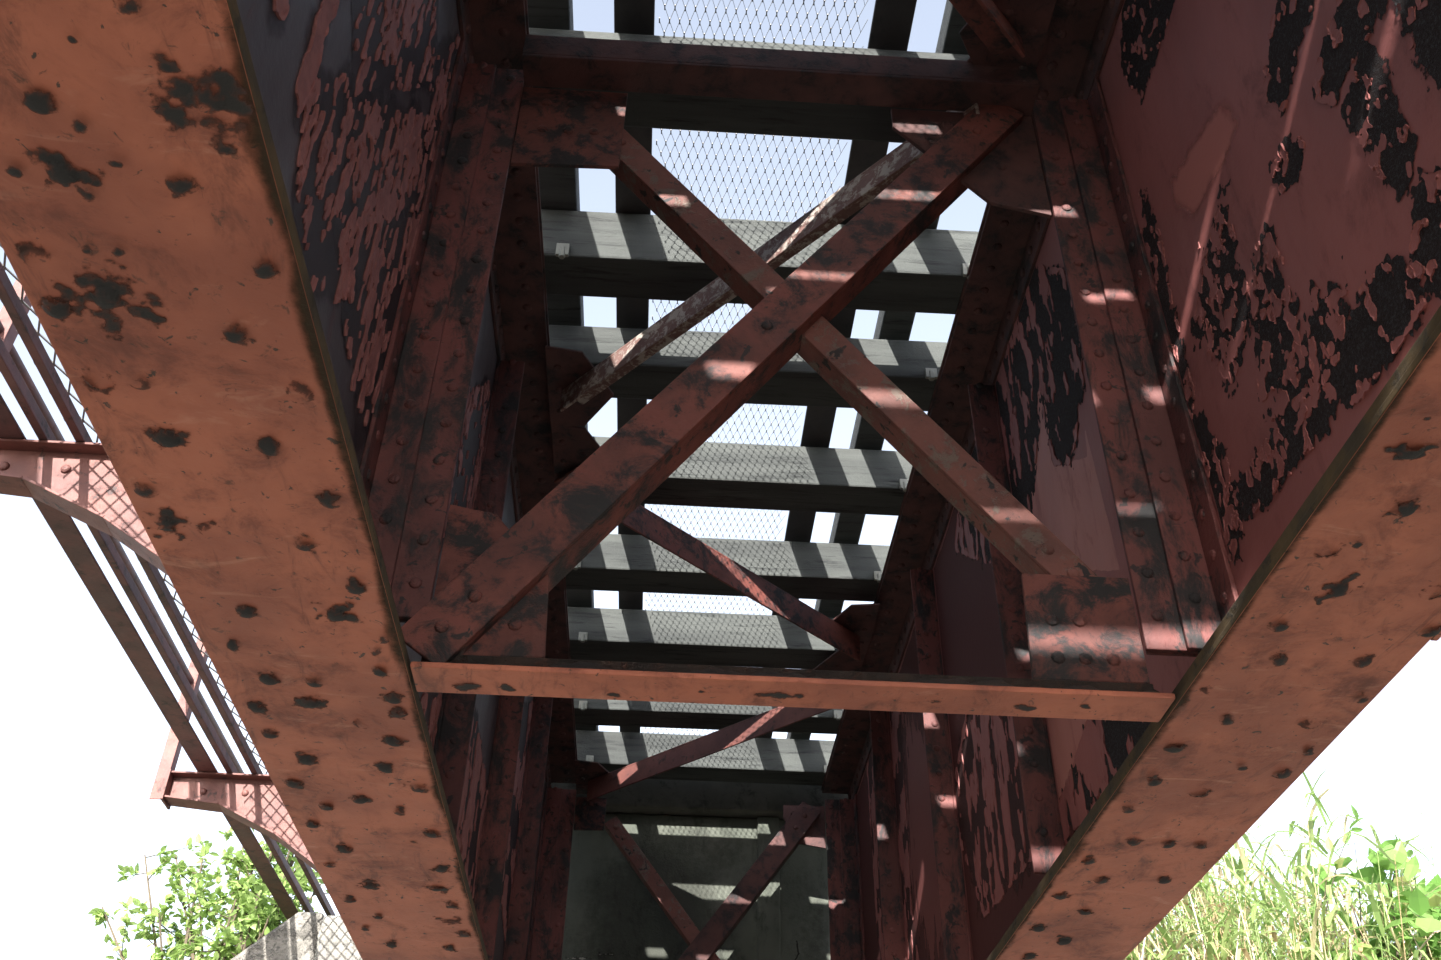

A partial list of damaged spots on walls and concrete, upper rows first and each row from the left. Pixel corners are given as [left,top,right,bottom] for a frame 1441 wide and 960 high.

corrosion [149,53,254,155]
peeling [1119,0,1175,105]
corrosion [6,147,123,202]
peeling [294,0,460,450]
corrosion [40,246,167,341]
peeling [1137,0,1441,565]
corrosion [145,427,190,448]
peeling [995,263,1086,514]
corrosion [134,483,216,541]
corrosion [311,577,367,622]
peeling [456,709,488,899]
peeling [954,714,1033,919]